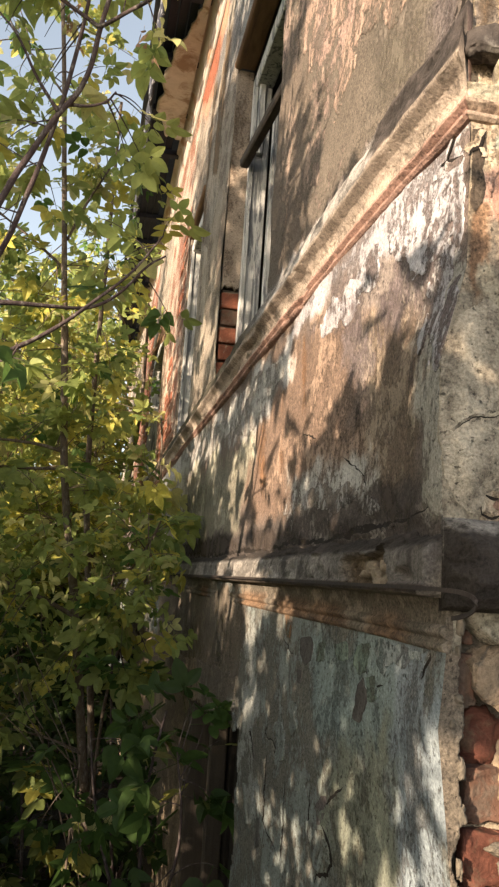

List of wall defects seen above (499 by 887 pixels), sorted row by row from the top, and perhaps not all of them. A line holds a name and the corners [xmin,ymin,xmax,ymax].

peeling [287,0,406,123]
crack [451,0,466,22]
peeling [279,101,315,234]
peeling [320,125,499,372]
crack [451,411,499,431]
water stain [179,534,238,558]
spalling [359,560,388,584]
peeling [297,636,427,723]
spalling [450,614,499,887]
peeling [242,783,271,884]
peeling [295,768,329,873]